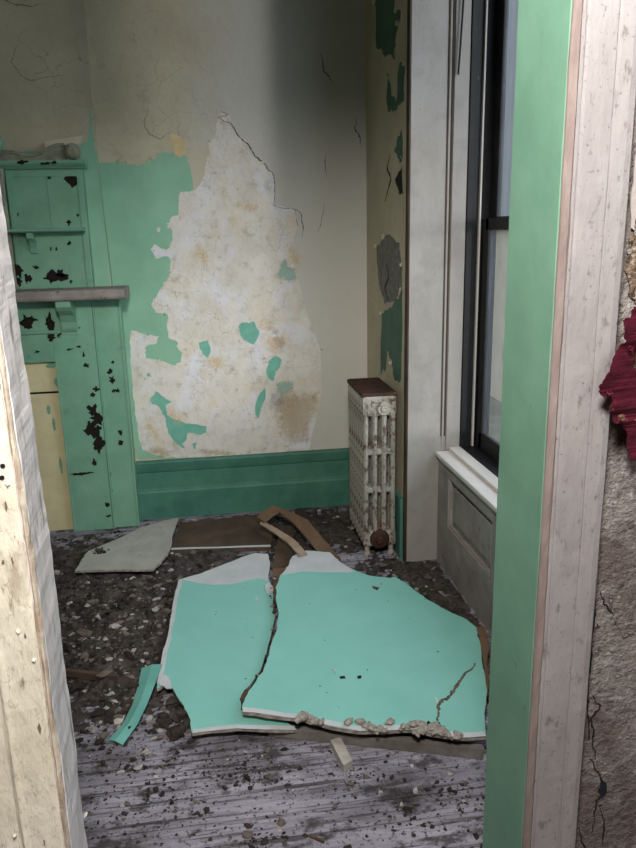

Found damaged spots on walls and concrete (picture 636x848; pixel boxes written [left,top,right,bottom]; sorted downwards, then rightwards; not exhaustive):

peeling [372,0,405,114]
peeling [391,128,403,195]
peeling [15,106,322,459]
peeling [374,234,403,382]
peeling [598,153,636,462]
peeling [72,386,106,476]
crack [579,591,613,848]